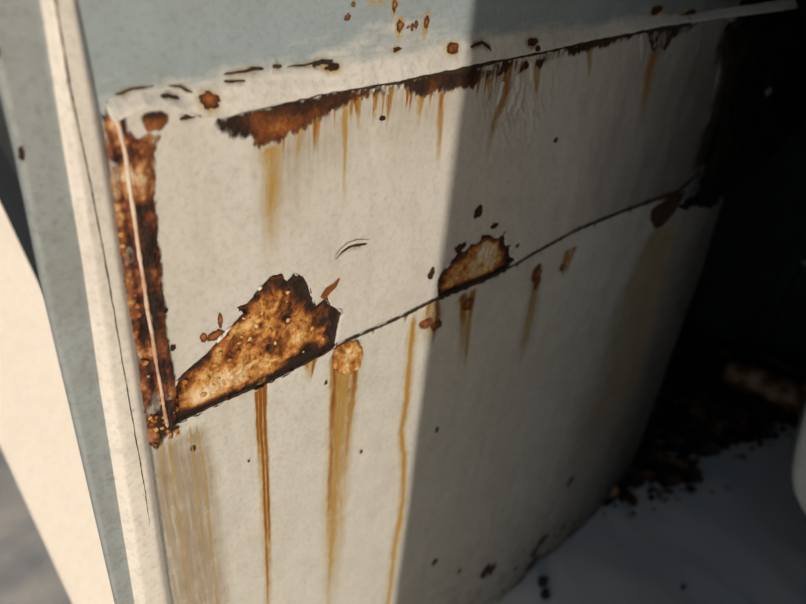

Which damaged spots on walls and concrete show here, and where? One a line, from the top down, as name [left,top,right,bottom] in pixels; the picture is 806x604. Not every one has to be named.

rust [216,60,523,215]
rust [535,36,632,91]
rust [644,23,697,100]
spalling [428,223,520,300]
rust [104,102,220,604]
spalling [173,273,343,423]
rust [254,379,271,604]
rust [328,340,363,566]
peeling [480,562,496,580]